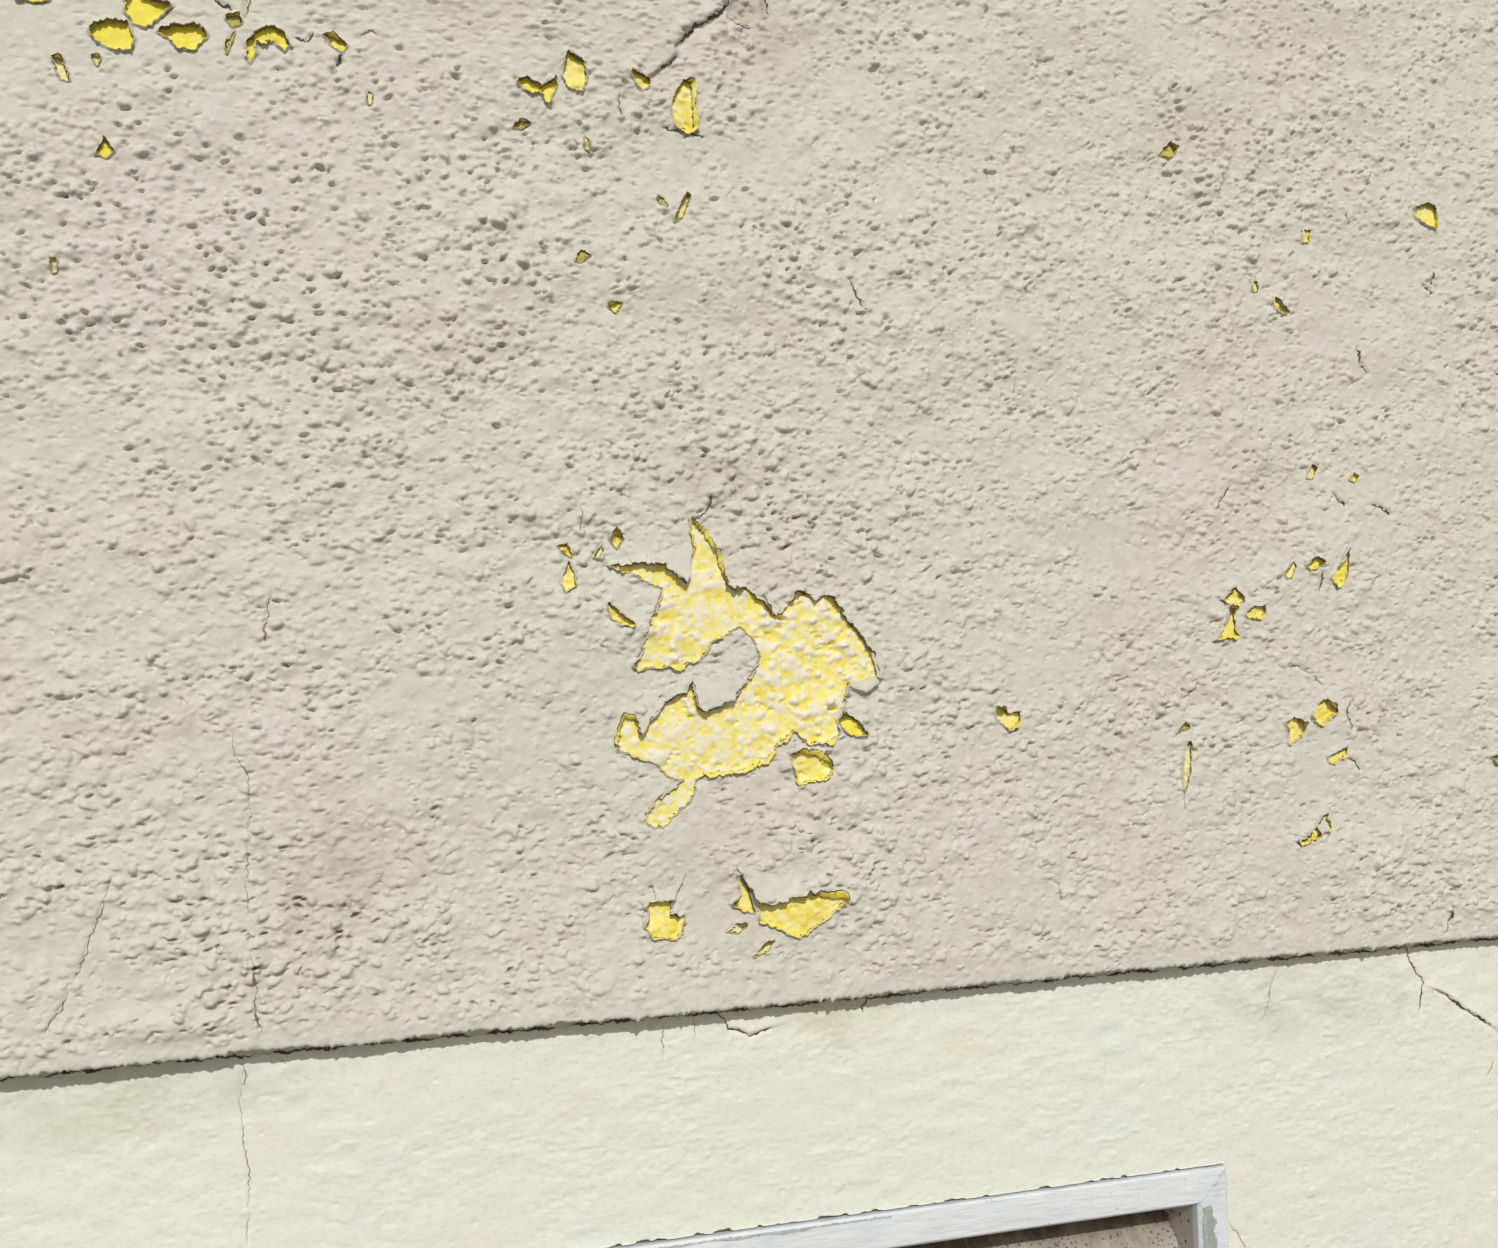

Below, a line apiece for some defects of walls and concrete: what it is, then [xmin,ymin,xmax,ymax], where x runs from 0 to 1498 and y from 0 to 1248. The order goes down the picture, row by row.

peeling [84,0,293,67]
crack [661,0,769,69]
peeling [514,49,590,103]
peeling [668,77,699,134]
peeling [1409,202,1439,231]
peeling [1282,544,1351,588]
peeling [1212,583,1267,642]
peeling [592,516,886,830]
peeling [1282,695,1339,746]
peeling [641,873,687,941]
peeling [726,866,850,959]
crack [1404,944,1497,1074]